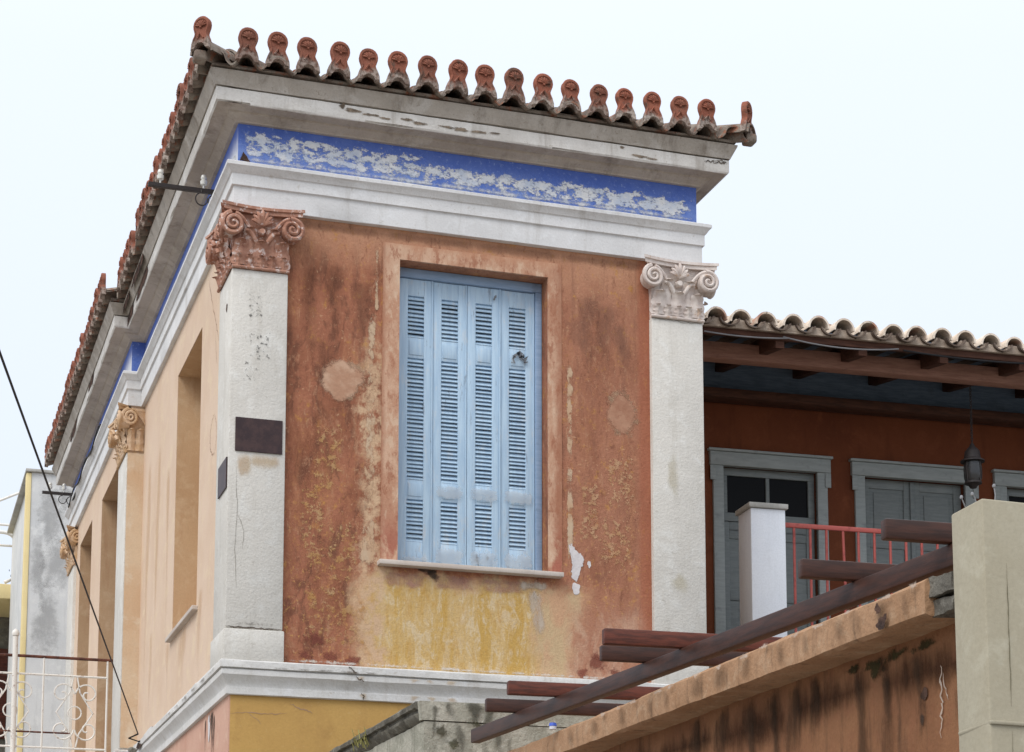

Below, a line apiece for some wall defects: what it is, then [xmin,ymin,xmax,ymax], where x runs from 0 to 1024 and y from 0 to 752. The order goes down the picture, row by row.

peeling [233,132,690,218]
peeling [567,458,635,595]
crack [1004,563,1012,690]
damp [663,679,863,752]
damp [883,654,957,708]